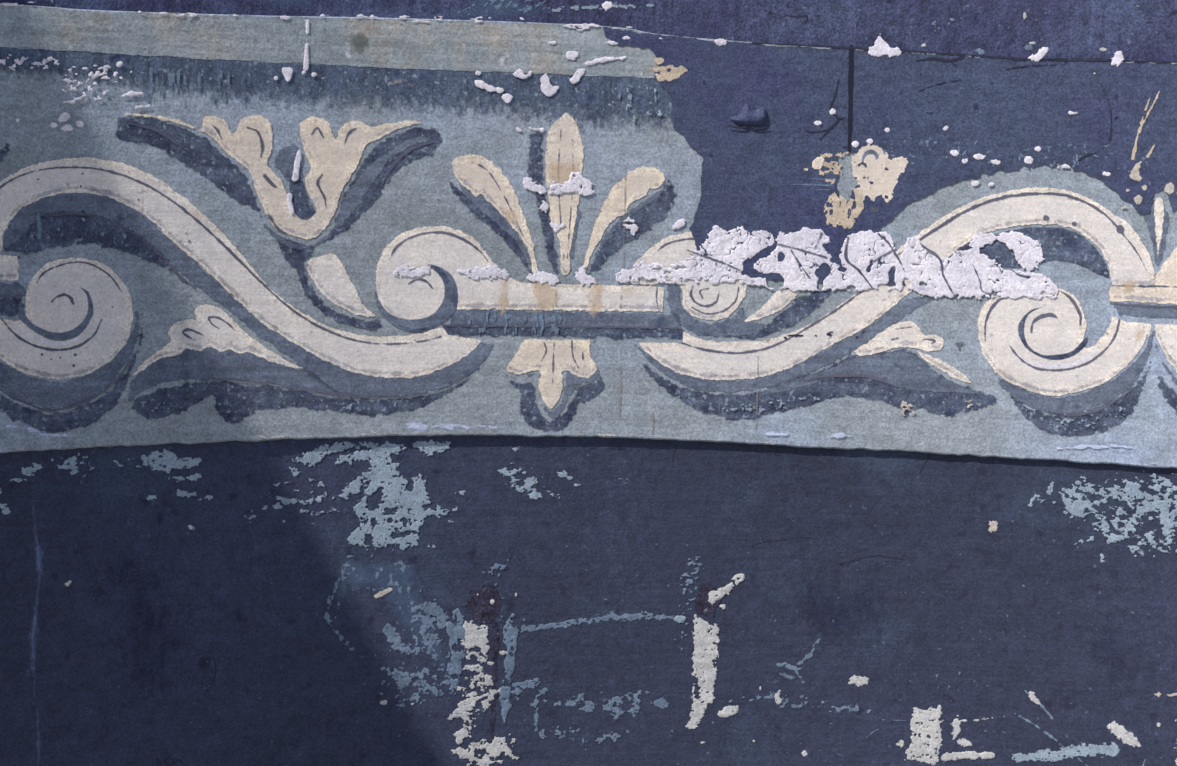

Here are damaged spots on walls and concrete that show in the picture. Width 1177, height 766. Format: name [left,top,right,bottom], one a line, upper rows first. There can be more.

peeling [0,54,230,131]
crack [752,15,869,152]
crack [900,50,1177,161]
peeling [791,157,837,190]
peeling [623,217,638,236]
peeling [615,225,1058,300]
peeling [244,432,466,550]
peeling [1028,462,1177,563]
peeling [474,559,517,604]
peeling [446,608,669,766]
peeling [896,705,1005,766]
peeling [1107,721,1141,747]